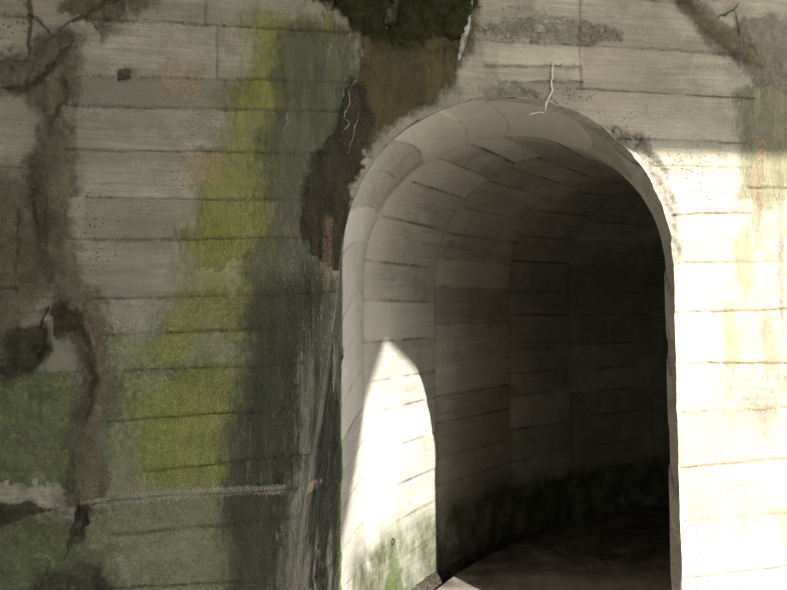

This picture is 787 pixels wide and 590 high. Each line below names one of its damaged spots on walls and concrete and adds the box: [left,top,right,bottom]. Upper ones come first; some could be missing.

crack [26,0,53,61]
crack [530,61,558,115]
damp [698,14,787,91]
damp [0,0,154,508]
damp [208,15,471,590]
damp [0,501,50,527]